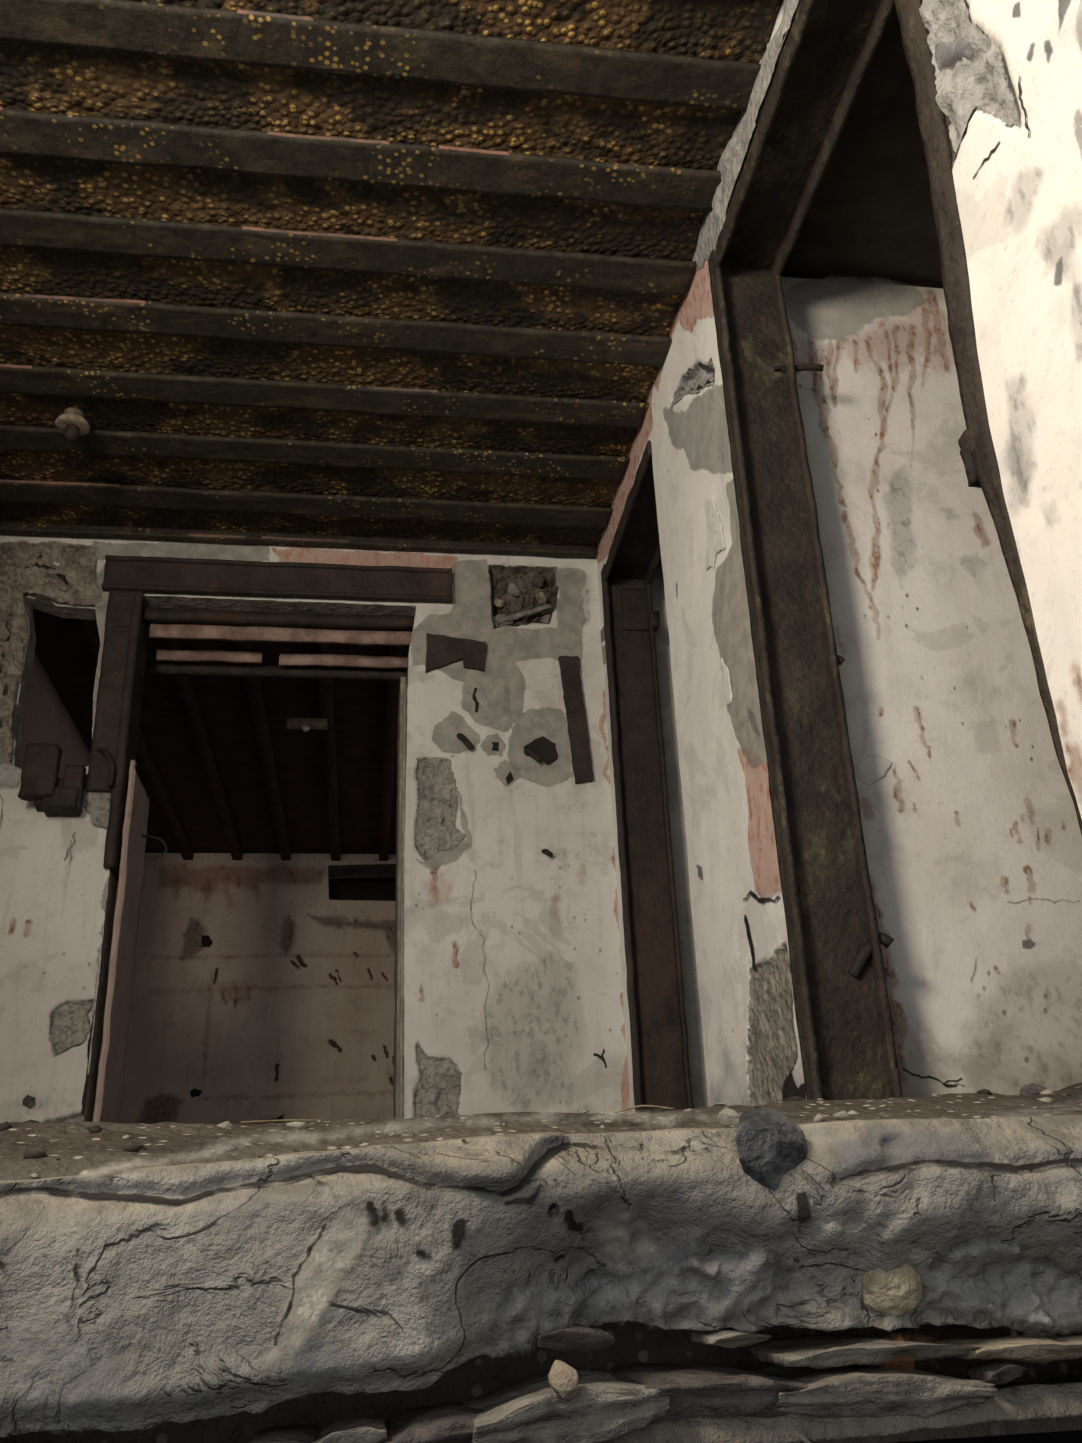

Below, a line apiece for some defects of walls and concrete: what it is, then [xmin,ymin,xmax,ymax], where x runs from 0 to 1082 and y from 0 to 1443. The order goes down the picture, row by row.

spalling [919,0,1019,165]
spalling [670,0,799,336]
rust [793,339,870,437]
rust [879,297,948,412]
rust [855,519,880,608]
spalling [0,541,102,765]
peeling [272,547,586,871]
peeling [598,358,805,1106]
spalling [413,1043,463,1117]
crack [0,1142,709,1205]
crack [840,1158,1082,1180]
crack [66,1248,79,1326]